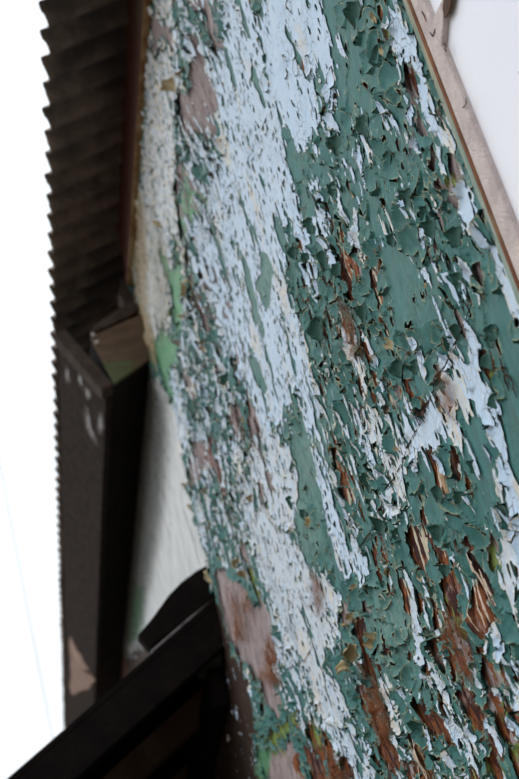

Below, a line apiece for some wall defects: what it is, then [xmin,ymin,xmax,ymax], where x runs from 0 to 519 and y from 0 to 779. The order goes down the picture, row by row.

peeling [123,0,519,779]